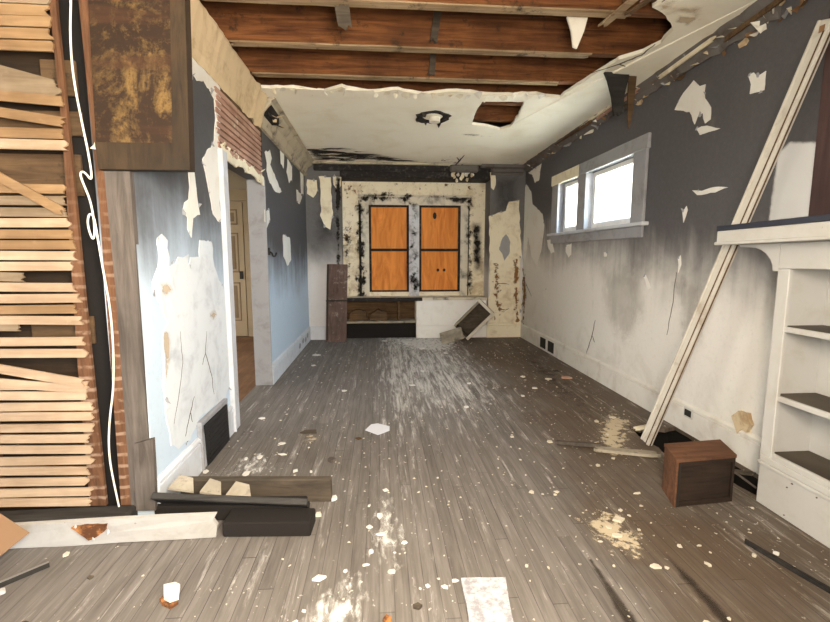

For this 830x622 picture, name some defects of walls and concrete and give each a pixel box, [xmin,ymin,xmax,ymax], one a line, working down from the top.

peeling [704,0,808,57]
flaking render [271,87,390,99]
peeling [748,71,766,94]
peeling [692,187,728,195]
peeling [769,142,816,220]
peeling [152,58,341,449]
peeling [488,142,571,323]